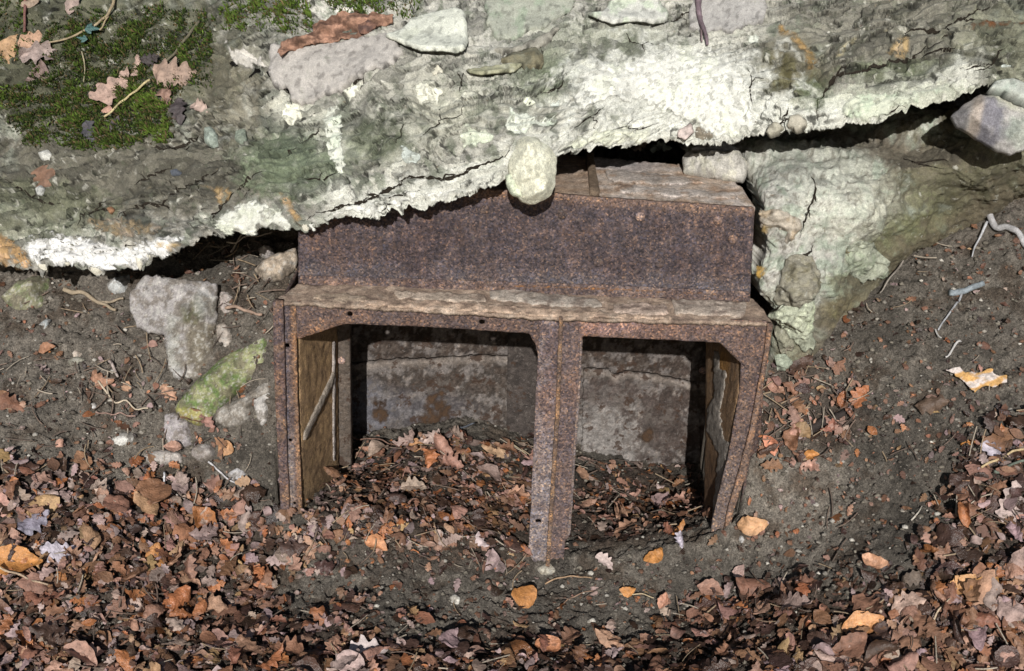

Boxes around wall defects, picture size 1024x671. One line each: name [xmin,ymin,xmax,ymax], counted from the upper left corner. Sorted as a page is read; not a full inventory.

crack [816,3,1005,121]
crack [5,136,262,243]
rust [372,400,388,422]
rust [421,391,451,424]